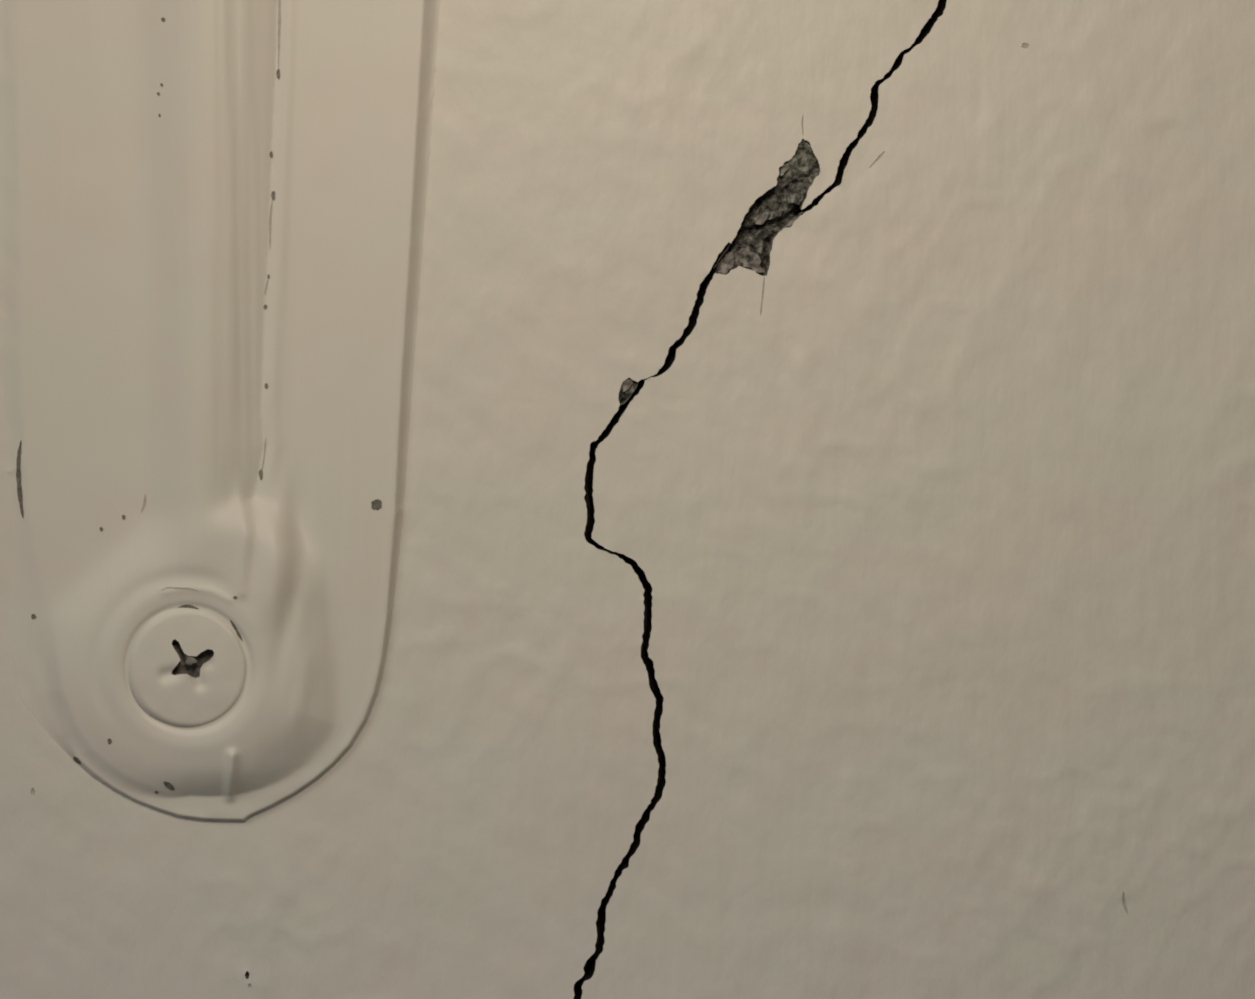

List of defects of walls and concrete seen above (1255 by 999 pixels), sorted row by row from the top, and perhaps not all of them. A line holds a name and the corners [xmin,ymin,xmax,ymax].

crack [758,278,766,316]
spalling [713,139,820,276]
crack [794,0,947,215]
crack [573,244,727,999]